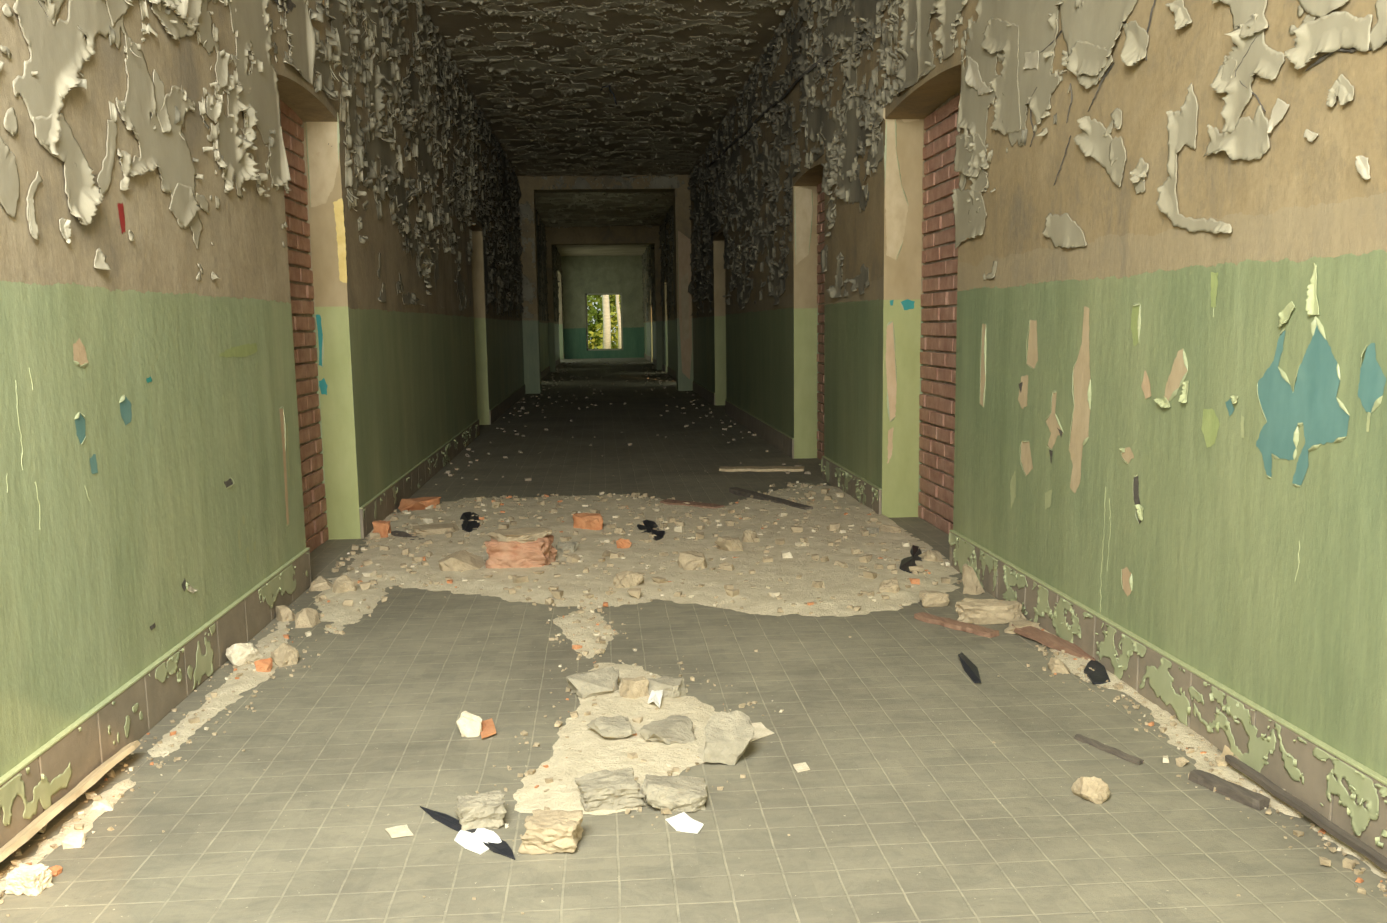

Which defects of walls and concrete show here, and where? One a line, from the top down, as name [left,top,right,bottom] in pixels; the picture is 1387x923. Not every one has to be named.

peeling [0,0,1149,380]
peeling [1073,0,1387,234]
peeling [315,314,328,395]
peeling [885,299,915,463]
peeling [1018,320,1038,409]
peeling [1046,306,1092,493]
peeling [1141,349,1189,408]
peeling [1225,263,1386,487]
peeling [1119,447,1143,524]
peeling [149,623,216,690]
peeling [949,532,1387,848]
peeling [0,763,72,826]